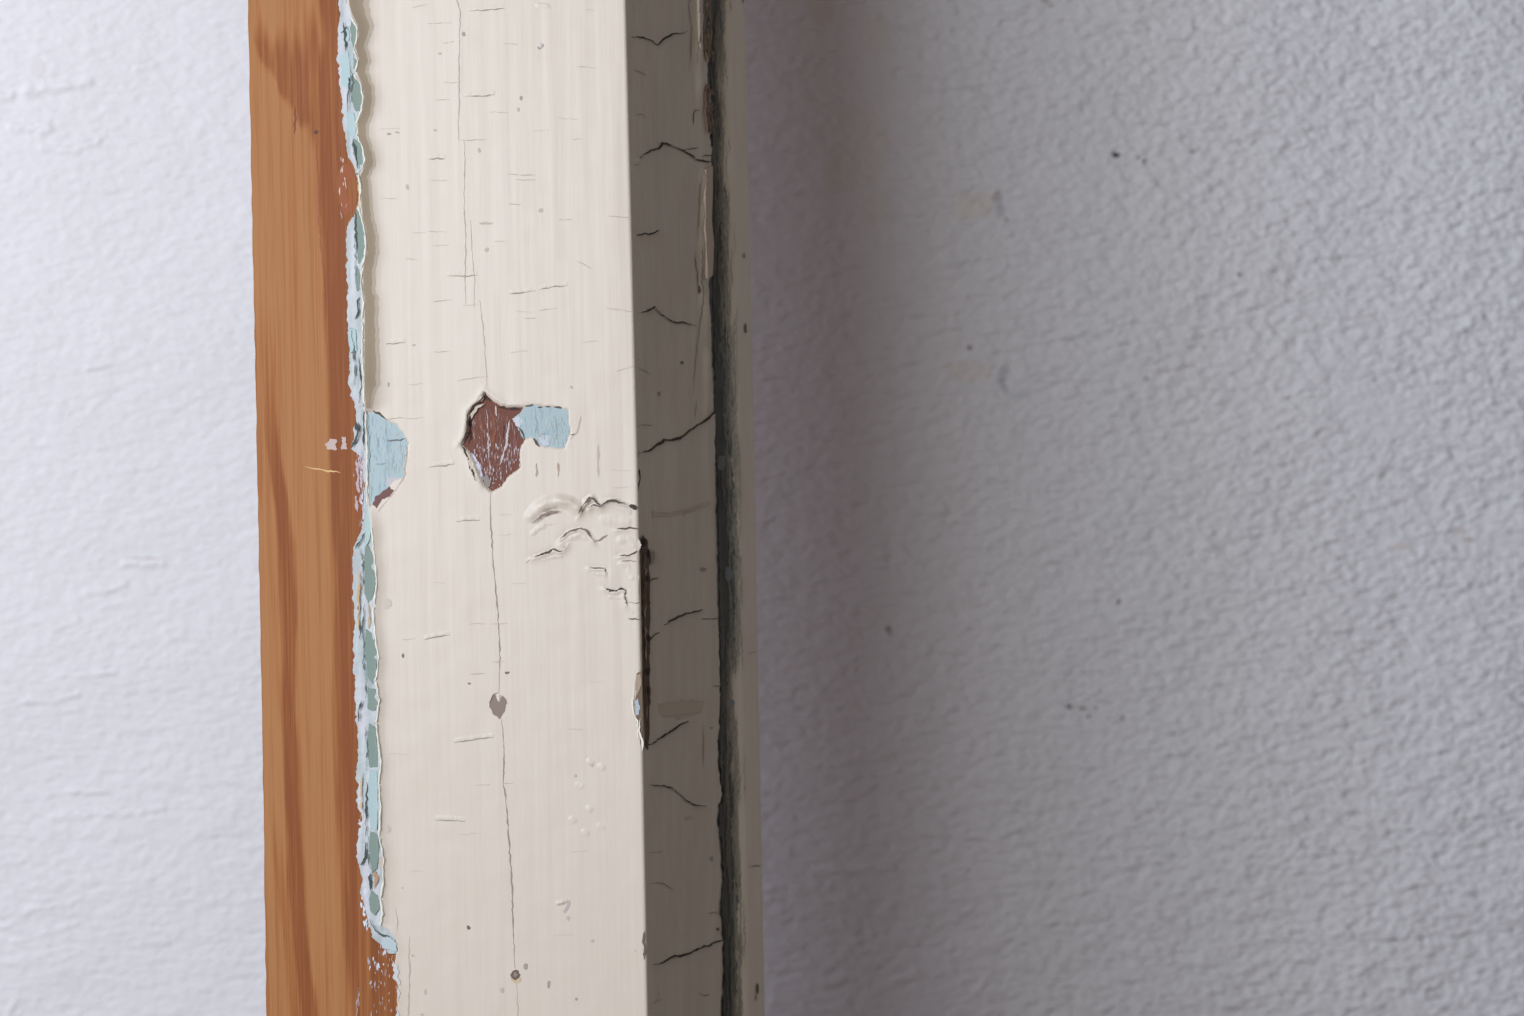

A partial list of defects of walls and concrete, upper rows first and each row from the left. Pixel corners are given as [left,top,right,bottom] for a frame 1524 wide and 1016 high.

peeling [370,527,385,925]
peeling [350,16,408,506]
peeling [463,393,524,491]
crack [341,0,759,1016]
spalling [631,536,651,750]